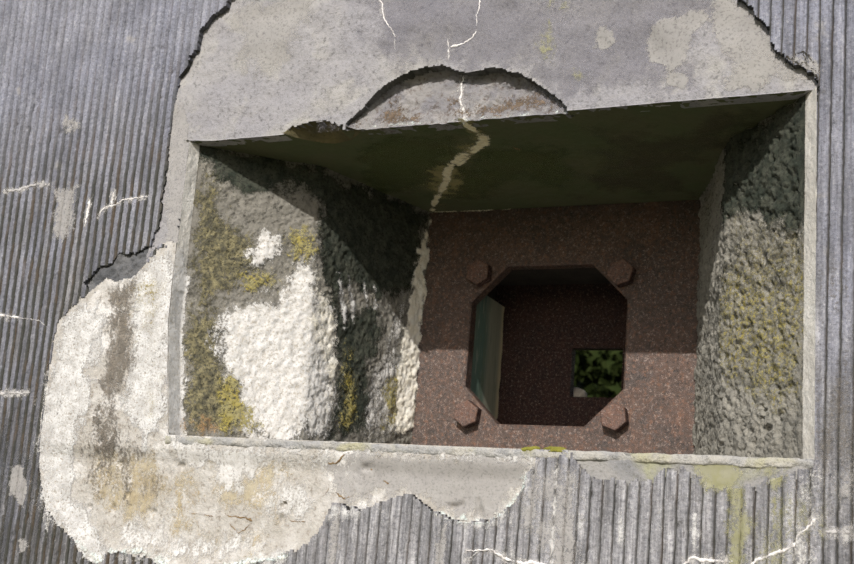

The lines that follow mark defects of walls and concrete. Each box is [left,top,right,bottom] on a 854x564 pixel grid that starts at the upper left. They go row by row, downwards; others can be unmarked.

crack [378,0,396,45]
crack [446,0,481,59]
spalling [170,0,819,174]
crack [430,76,509,213]
crack [3,181,49,194]
crack [83,188,149,227]
crack [0,313,47,327]
damp [118,103,584,564]
spalling [44,156,536,564]
crack [0,389,30,399]
crack [463,547,554,564]
crack [682,515,854,564]